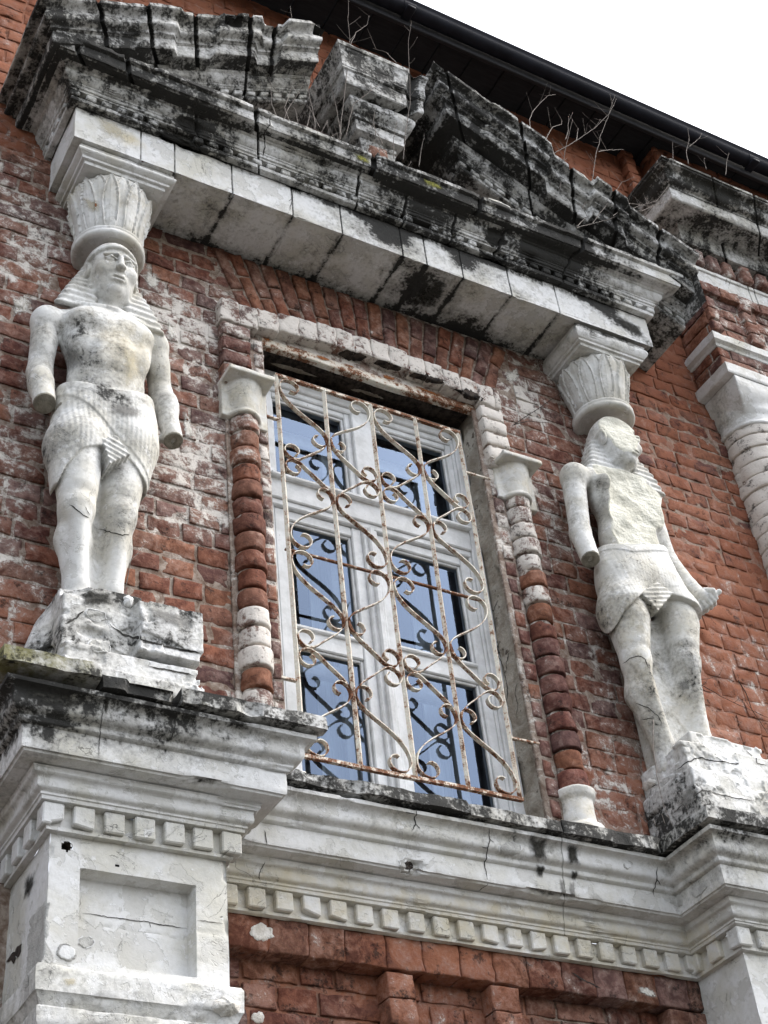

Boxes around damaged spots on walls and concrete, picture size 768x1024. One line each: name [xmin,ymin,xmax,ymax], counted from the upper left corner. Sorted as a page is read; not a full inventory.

leakage [414,281,445,307]
crack [680,750,764,768]
crack [479,830,493,891]
leakage [530,836,546,876]
leakage [561,845,578,897]
crack [86,913,223,929]
flaking render [6,900,95,988]